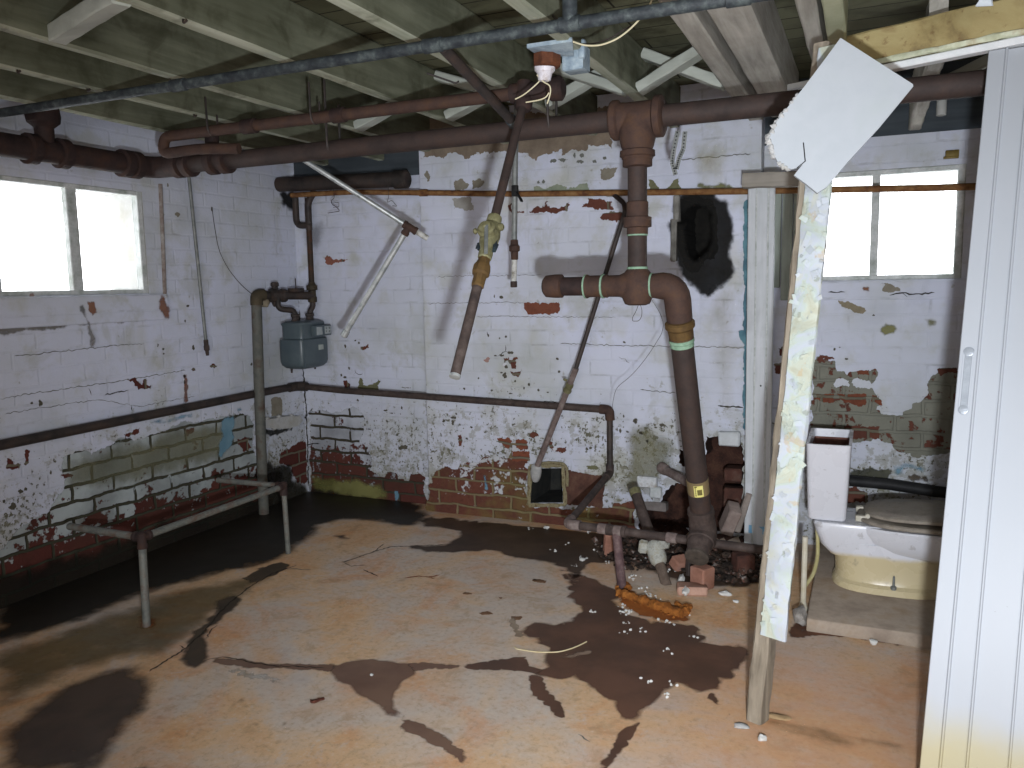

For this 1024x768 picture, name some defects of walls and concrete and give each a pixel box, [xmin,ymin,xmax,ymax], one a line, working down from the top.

peeling [452,178,484,211]
peeling [424,132,617,180]
peeling [649,179,681,189]
peeling [789,190,831,321]
peeling [0,413,258,578]
leakage [0,462,748,768]
peeling [279,367,689,535]
leakage [632,431,667,486]
spalling [705,436,745,542]
leakage [712,549,761,587]
peeling [760,491,794,626]
peeling [774,339,958,475]